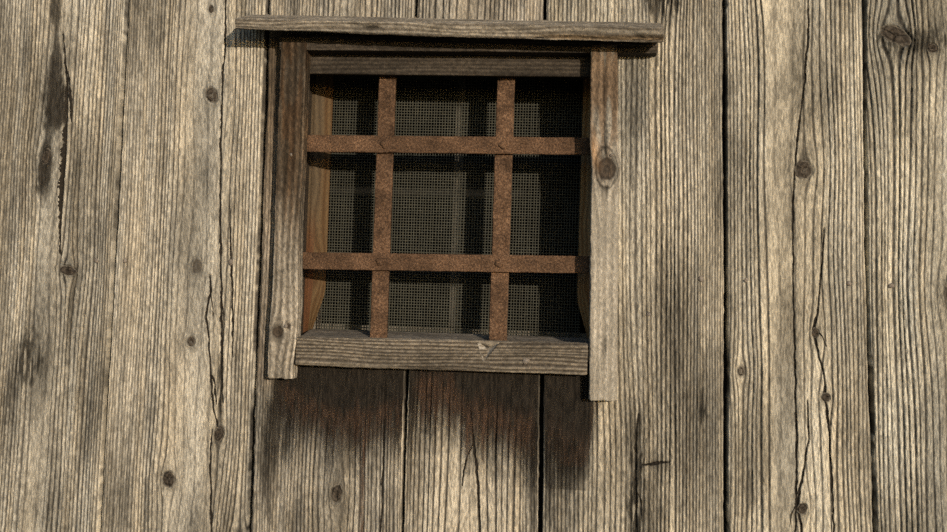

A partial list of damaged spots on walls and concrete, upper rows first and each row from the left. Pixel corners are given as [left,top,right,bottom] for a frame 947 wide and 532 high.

crack [205,0,234,531]